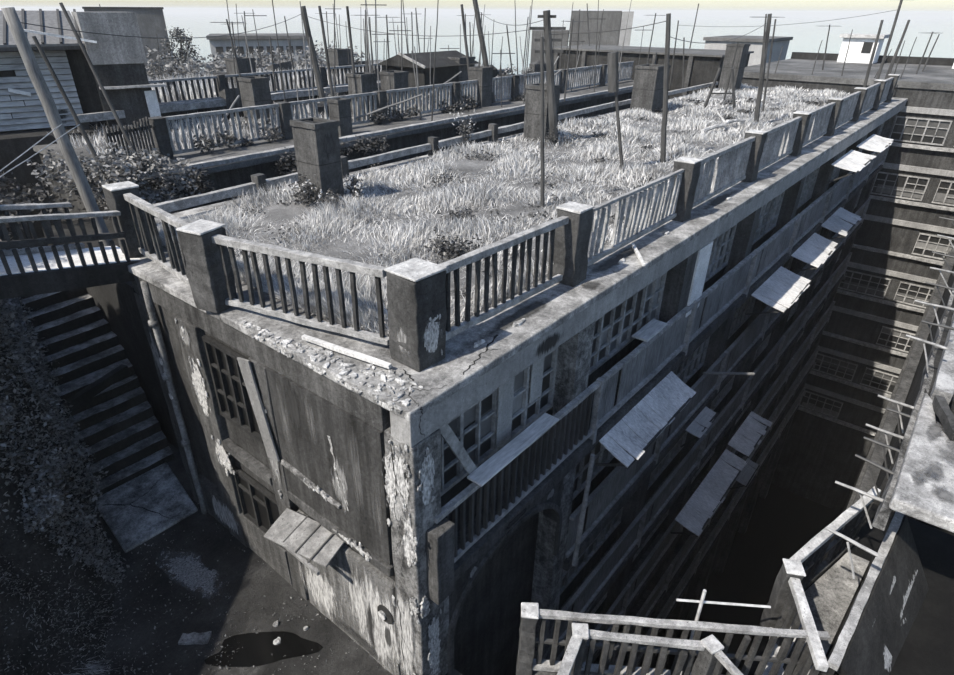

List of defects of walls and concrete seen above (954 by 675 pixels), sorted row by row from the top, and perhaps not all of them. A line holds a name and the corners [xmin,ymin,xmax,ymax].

peeling [175,318,211,417]
peeling [423,314,443,355]
crack [403,335,498,437]
peeling [211,435,235,477]
peeling [385,440,435,567]
peeling [409,595,442,675]